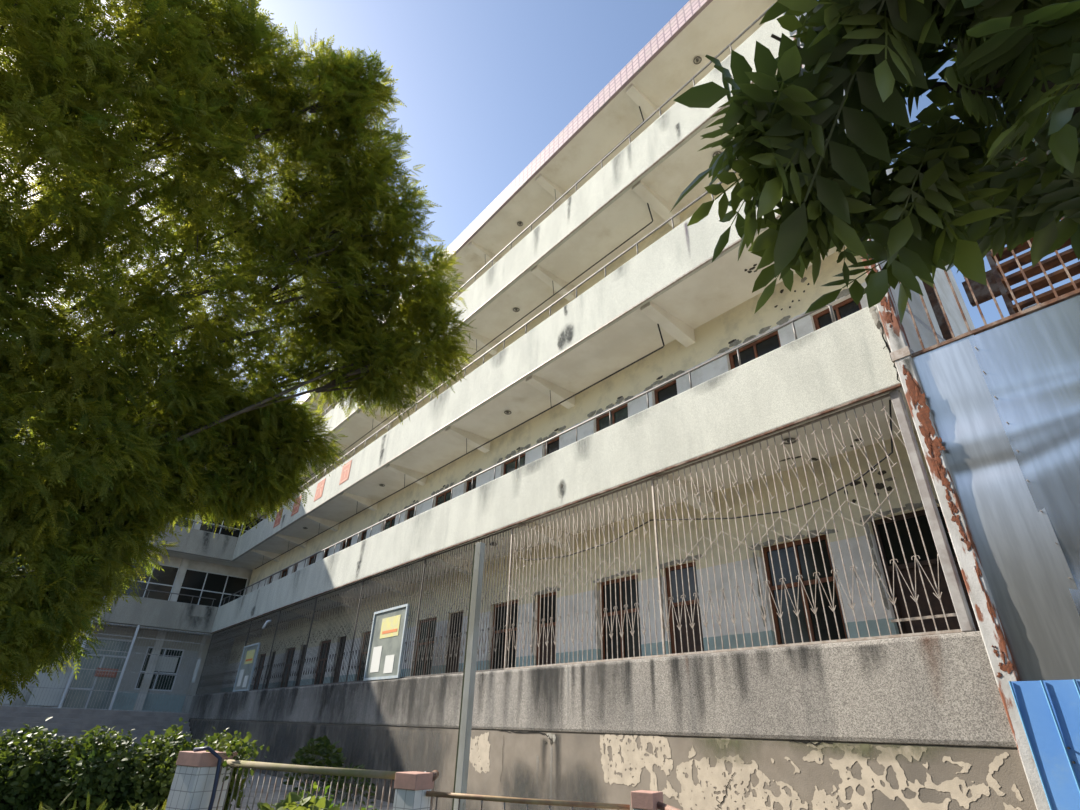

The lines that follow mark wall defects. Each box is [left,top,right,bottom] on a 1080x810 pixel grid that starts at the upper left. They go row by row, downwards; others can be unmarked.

rust [902,358,1014,678]
water stain [533,661,630,704]
peeling [600,734,1023,810]